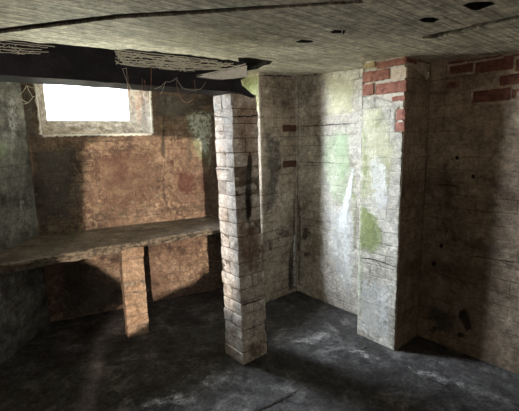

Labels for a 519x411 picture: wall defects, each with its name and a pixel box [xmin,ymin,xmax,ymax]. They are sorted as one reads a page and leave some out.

flaking render [362,57,430,133]
flaking render [446,54,519,105]
water stain [338,169,376,287]